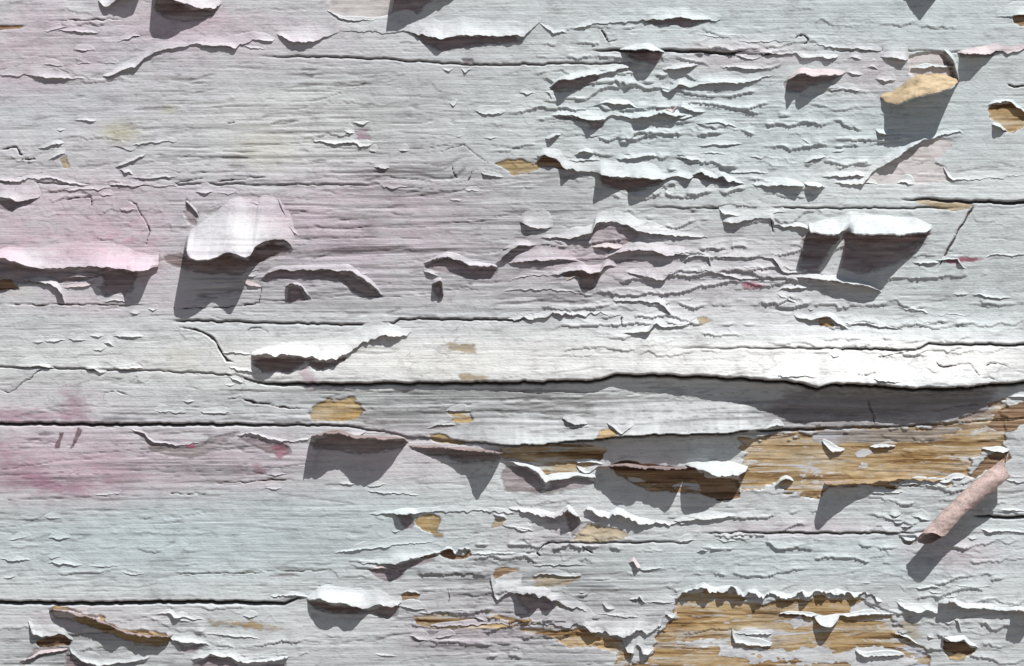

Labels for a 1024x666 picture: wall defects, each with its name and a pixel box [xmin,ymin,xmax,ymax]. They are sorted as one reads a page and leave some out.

peeling [0,0,1024,192]
peeling [0,182,382,314]
peeling [423,199,1024,333]
peeling [222,321,411,386]
peeling [597,422,634,439]
peeling [741,366,990,436]
crack [936,362,1006,380]
peeling [822,439,1024,545]
peeling [271,476,1024,666]
peeling [19,605,289,666]